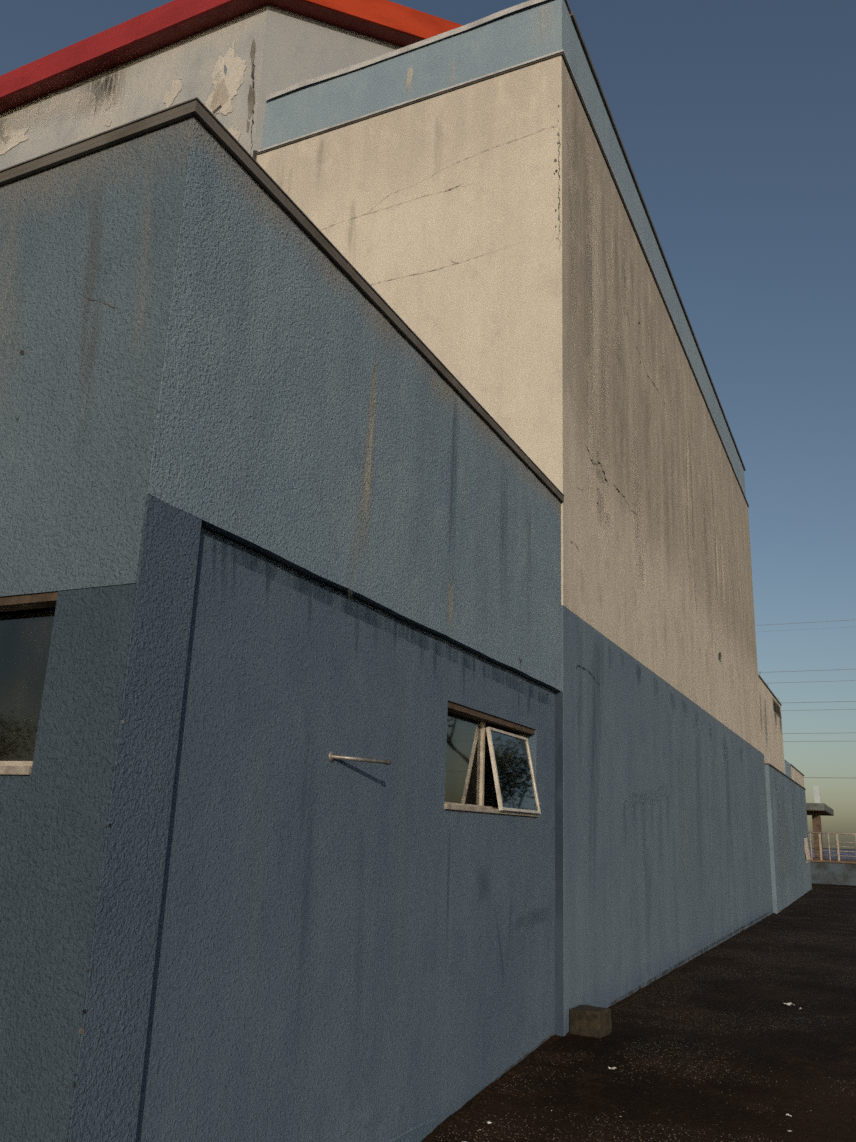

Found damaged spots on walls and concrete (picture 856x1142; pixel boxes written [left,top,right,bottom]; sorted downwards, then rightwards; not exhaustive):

peeling [205,38,256,148]